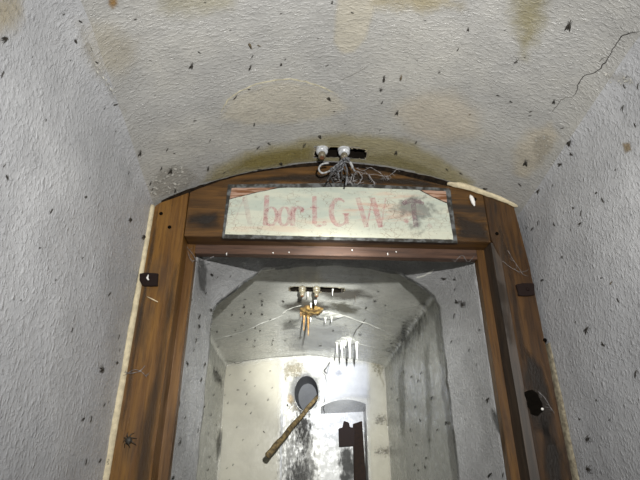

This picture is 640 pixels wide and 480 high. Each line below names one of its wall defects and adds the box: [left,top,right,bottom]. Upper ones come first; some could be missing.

crack [552,31,639,112]
water stain [243,174,433,187]
water stain [215,288,420,360]